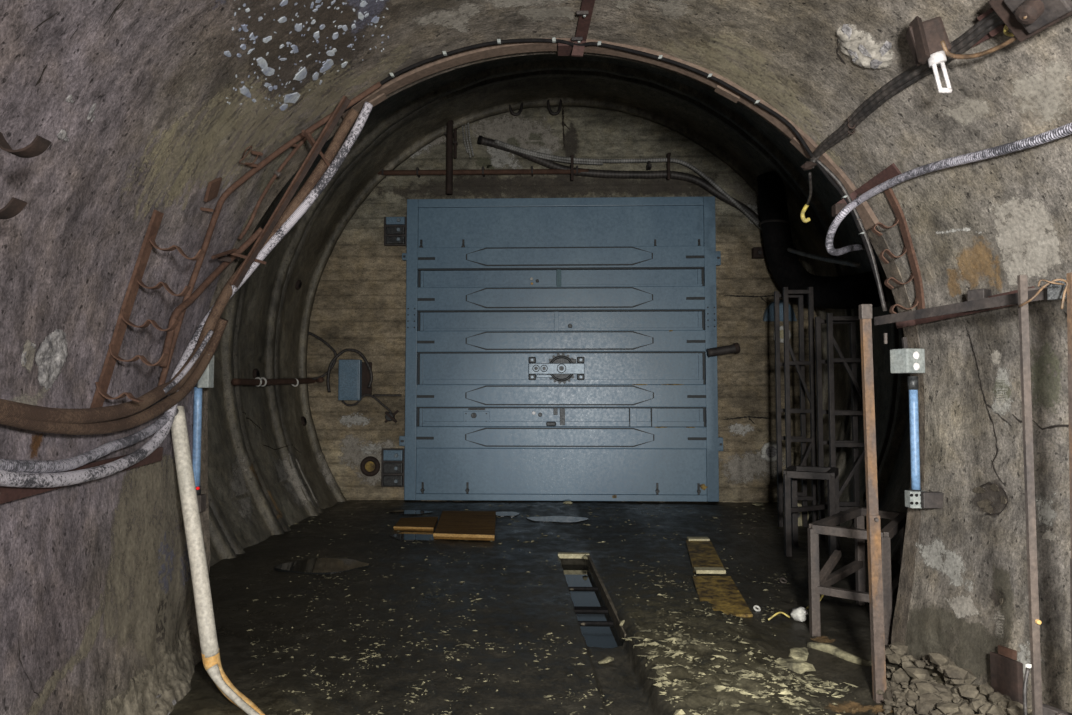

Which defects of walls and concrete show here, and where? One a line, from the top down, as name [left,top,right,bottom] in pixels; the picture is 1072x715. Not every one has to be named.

peeling [224,0,389,111]
spalling [836,24,893,69]
crack [965,324,1069,484]